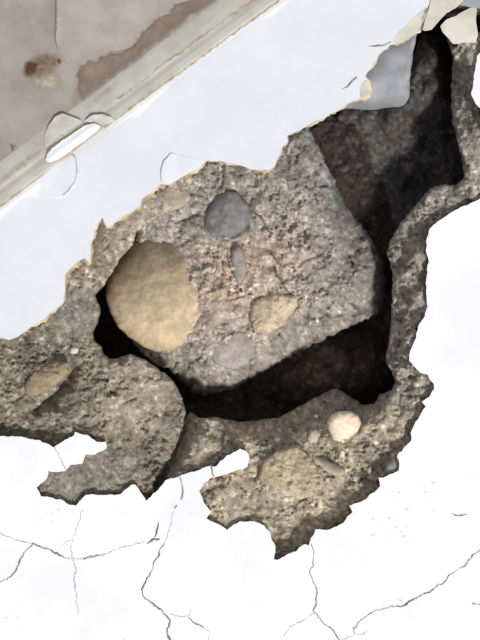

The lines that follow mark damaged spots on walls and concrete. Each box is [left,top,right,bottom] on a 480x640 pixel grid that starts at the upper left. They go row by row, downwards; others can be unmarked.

peeling [54,0,211,97]
spalling [0,113,397,506]
spalling [153,0,480,560]
crack [0,477,209,640]
crack [284,544,480,640]